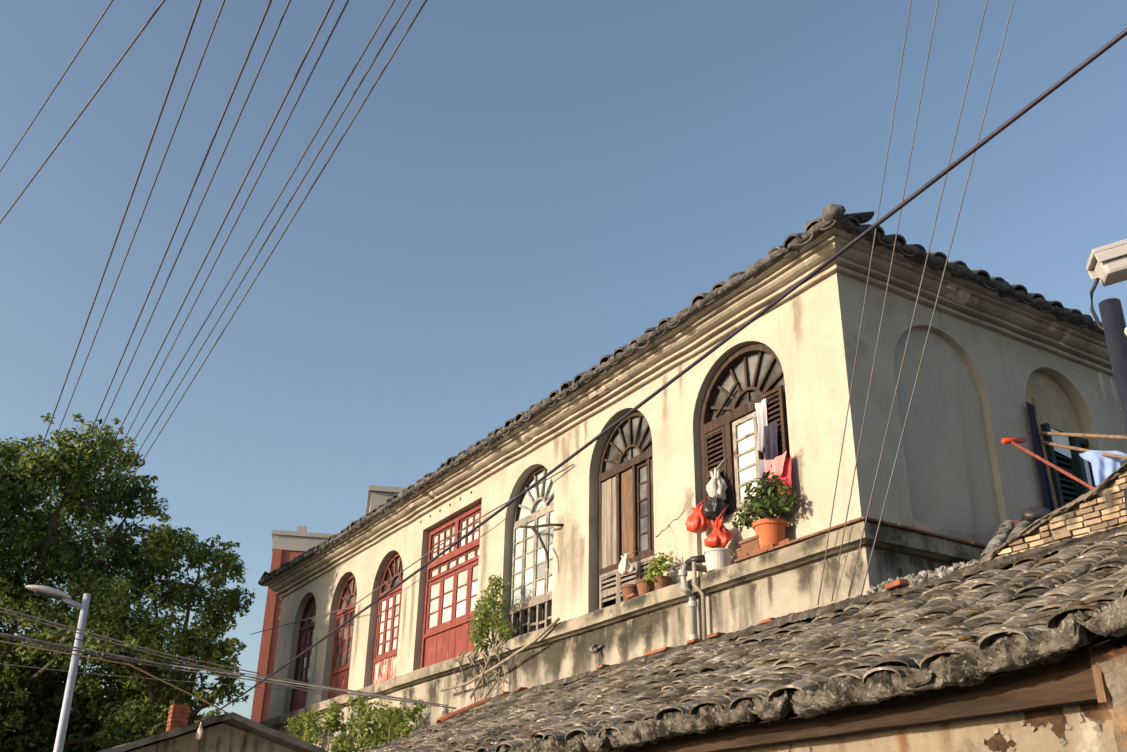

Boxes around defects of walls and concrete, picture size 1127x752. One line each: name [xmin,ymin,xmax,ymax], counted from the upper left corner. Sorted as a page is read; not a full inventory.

water stain [456,595,682,693]
spalling [981,728,1017,752]
spalling [1021,702,1114,752]